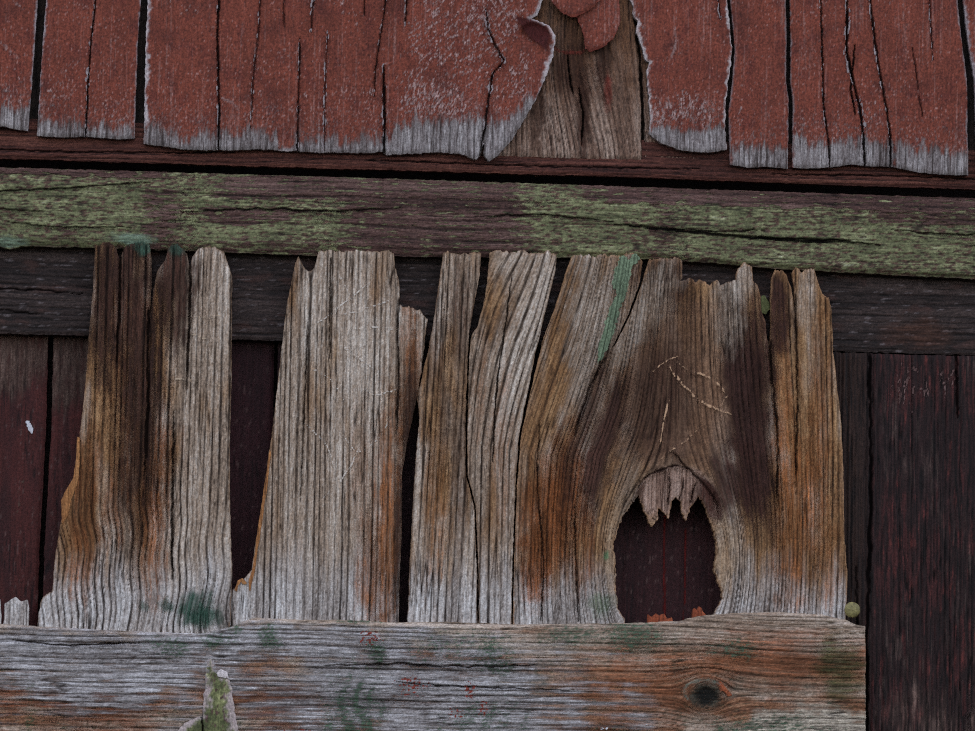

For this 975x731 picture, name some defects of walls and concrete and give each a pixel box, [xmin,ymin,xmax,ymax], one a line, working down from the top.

crack [0,0,235,154]
peeling [0,87,282,151]
peeling [294,0,535,161]
crack [364,0,700,170]
peeling [551,0,620,52]
peeling [649,90,968,175]
crack [773,0,975,180]